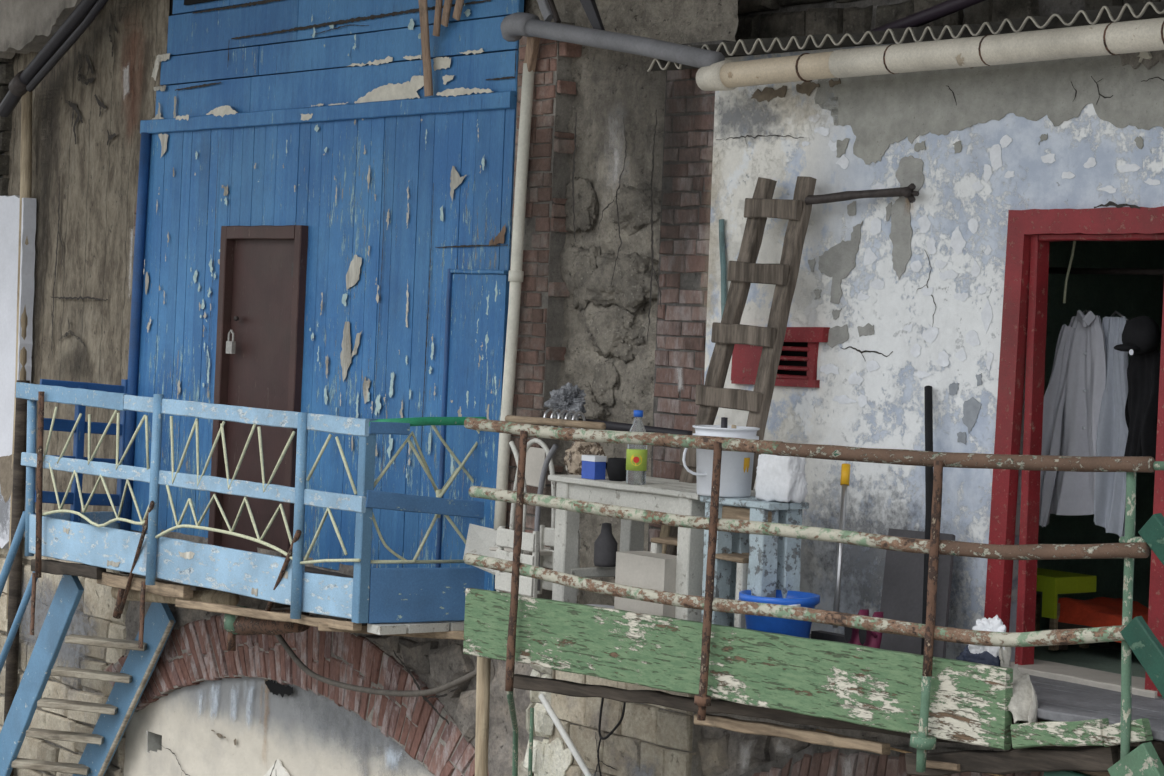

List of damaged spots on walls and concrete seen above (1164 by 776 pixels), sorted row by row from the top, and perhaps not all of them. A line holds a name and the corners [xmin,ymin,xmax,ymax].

peeling [151,53,189,121]
peeling [206,105,238,117]
peeling [301,31,493,132]
crack [716,135,804,144]
crack [1071,76,1113,104]
crack [572,110,662,340]
flaking render [751,50,1164,348]
peeling [342,246,379,306]
peeling [309,293,362,416]
crack [842,346,893,360]
peeling [356,372,411,418]
flaking render [949,373,982,444]